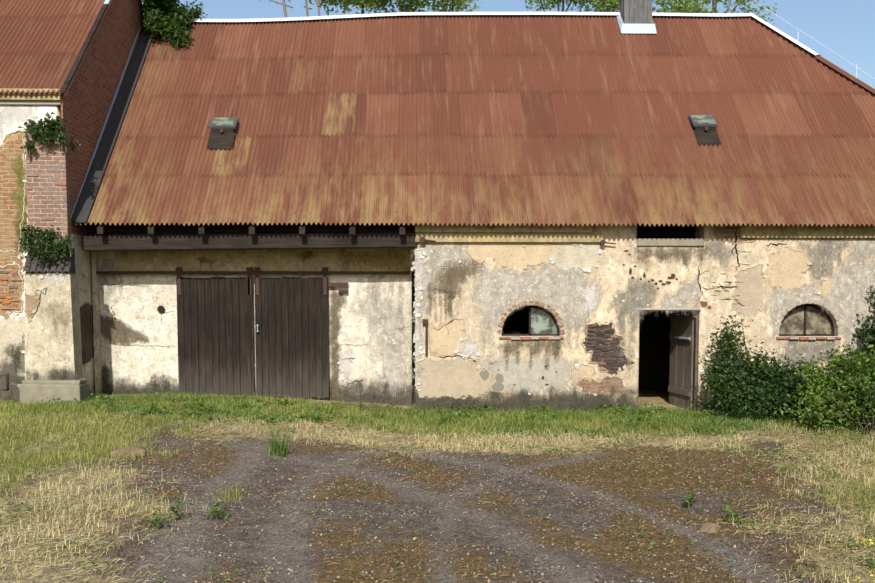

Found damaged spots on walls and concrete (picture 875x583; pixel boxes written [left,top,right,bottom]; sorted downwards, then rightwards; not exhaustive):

flaking render [0,129,41,370]
peeling [39,272,66,288]